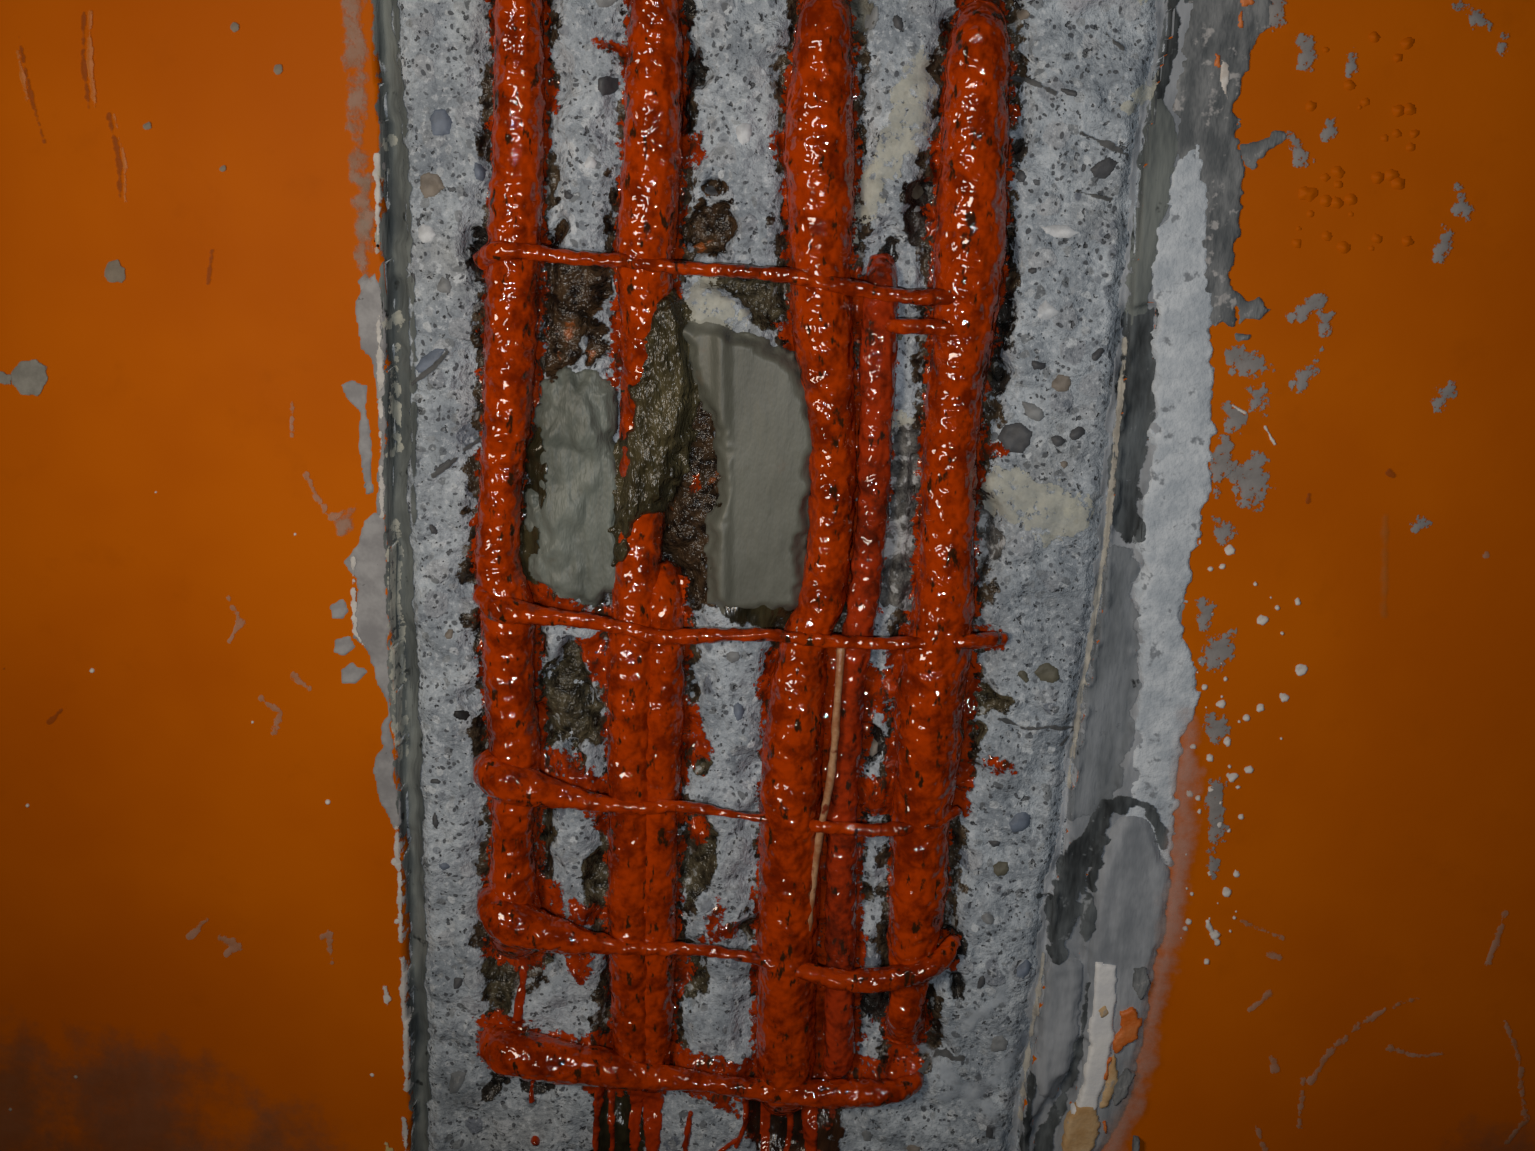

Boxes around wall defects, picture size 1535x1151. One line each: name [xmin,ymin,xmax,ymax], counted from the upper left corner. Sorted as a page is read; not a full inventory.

spalling [681,0,710,134]
peeling [0,359,48,396]
spalling [539,219,615,383]
spalling [681,179,738,257]
spalling [700,276,790,331]
spalling [877,179,936,262]
spalling [988,195,1019,395]
peeling [330,0,414,1092]
spalling [661,401,721,615]
spalling [879,423,921,611]
peeling [1008,0,1337,1151]
spalling [534,628,604,769]